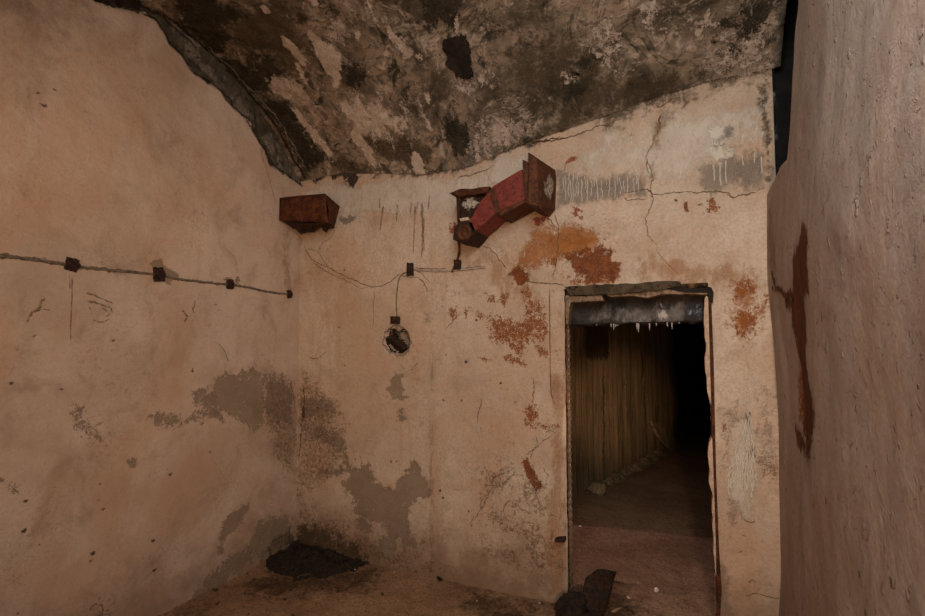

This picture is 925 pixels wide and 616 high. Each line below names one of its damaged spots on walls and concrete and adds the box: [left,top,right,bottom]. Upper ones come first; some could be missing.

water stain [163,0,772,254]
crack [529,122,614,147]
crack [625,100,755,270]
corrosion [449,225,621,368]
corrosion [727,222,815,463]
peeling [191,503,293,600]
peeling [147,363,444,560]
corrosion [479,458,549,516]